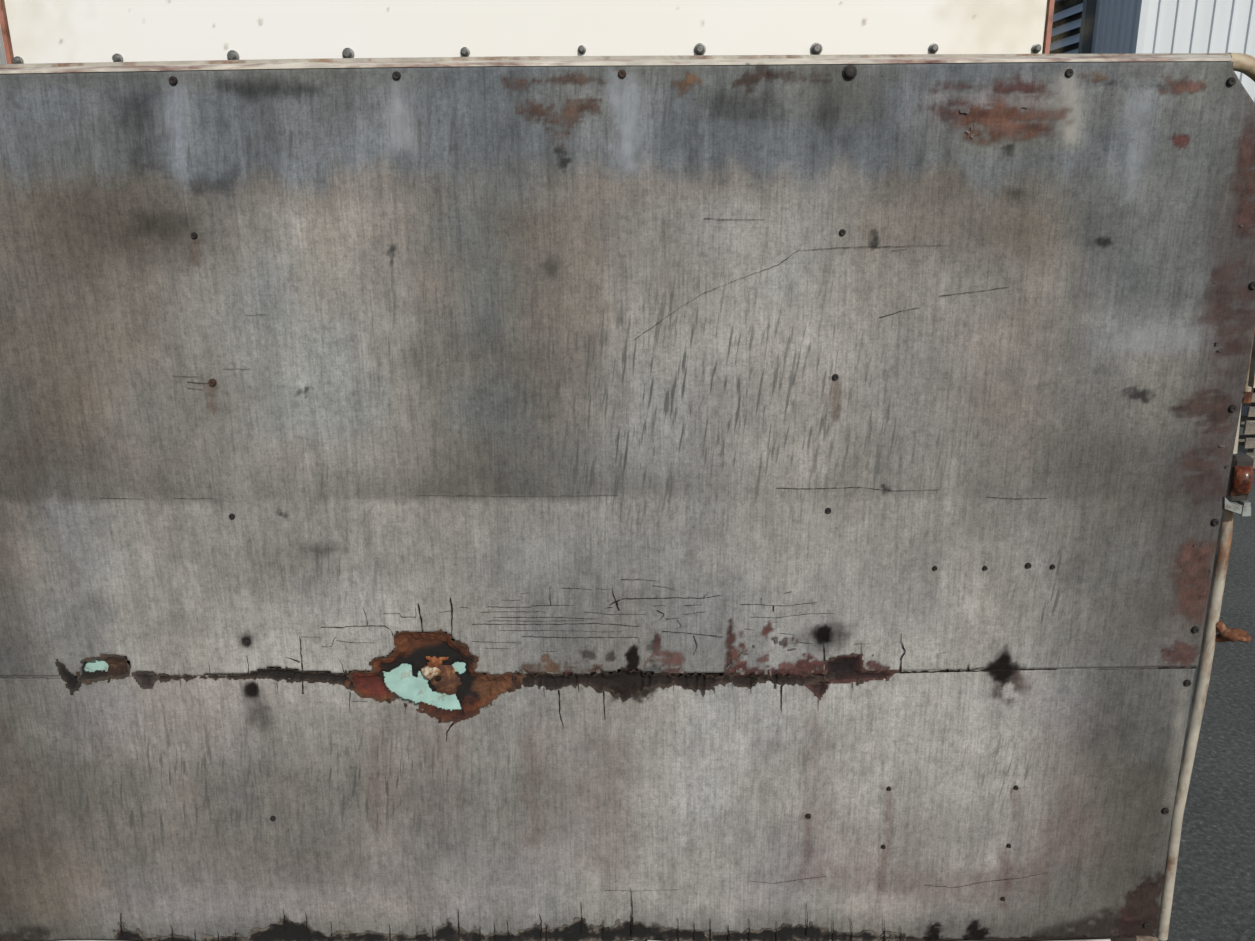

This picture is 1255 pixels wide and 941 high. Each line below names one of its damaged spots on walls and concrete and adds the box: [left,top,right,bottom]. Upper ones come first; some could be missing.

peeling [421,656,449,680]
crack [895,652,1057,674]